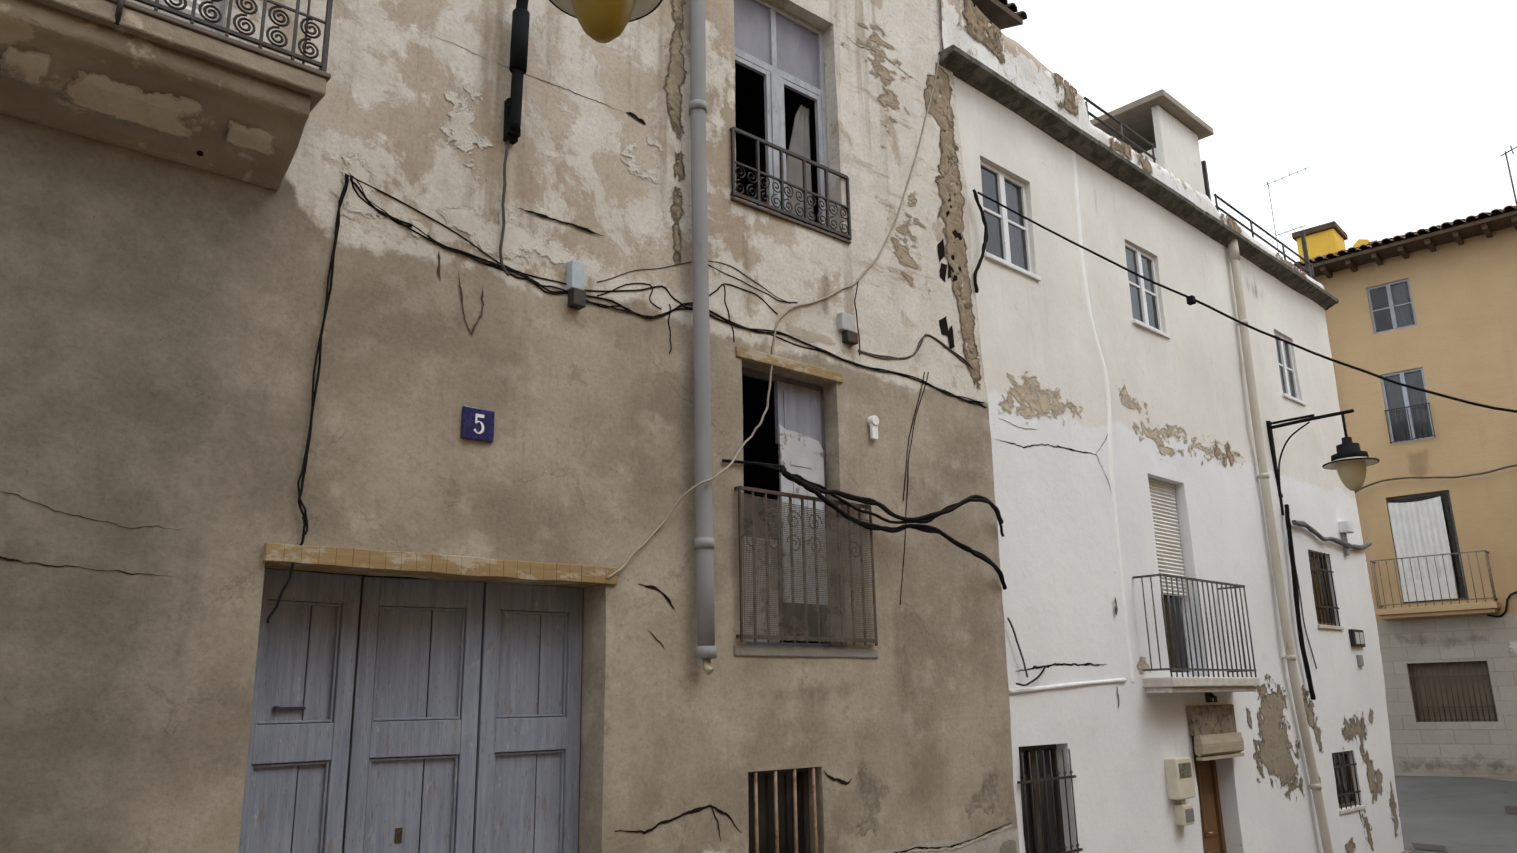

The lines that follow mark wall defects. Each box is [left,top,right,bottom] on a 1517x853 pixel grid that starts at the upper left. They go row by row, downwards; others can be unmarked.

peeling [0,46,52,86]
peeling [57,69,203,156]
peeling [226,120,277,157]
spalling [619,0,687,267]
spalling [841,3,982,389]
peeling [994,371,1084,425]
peeling [1115,380,1244,472]
crack [0,491,178,530]
crack [0,556,175,577]
crack [614,805,742,840]
peeling [1246,674,1324,801]
peeling [1342,708,1402,853]